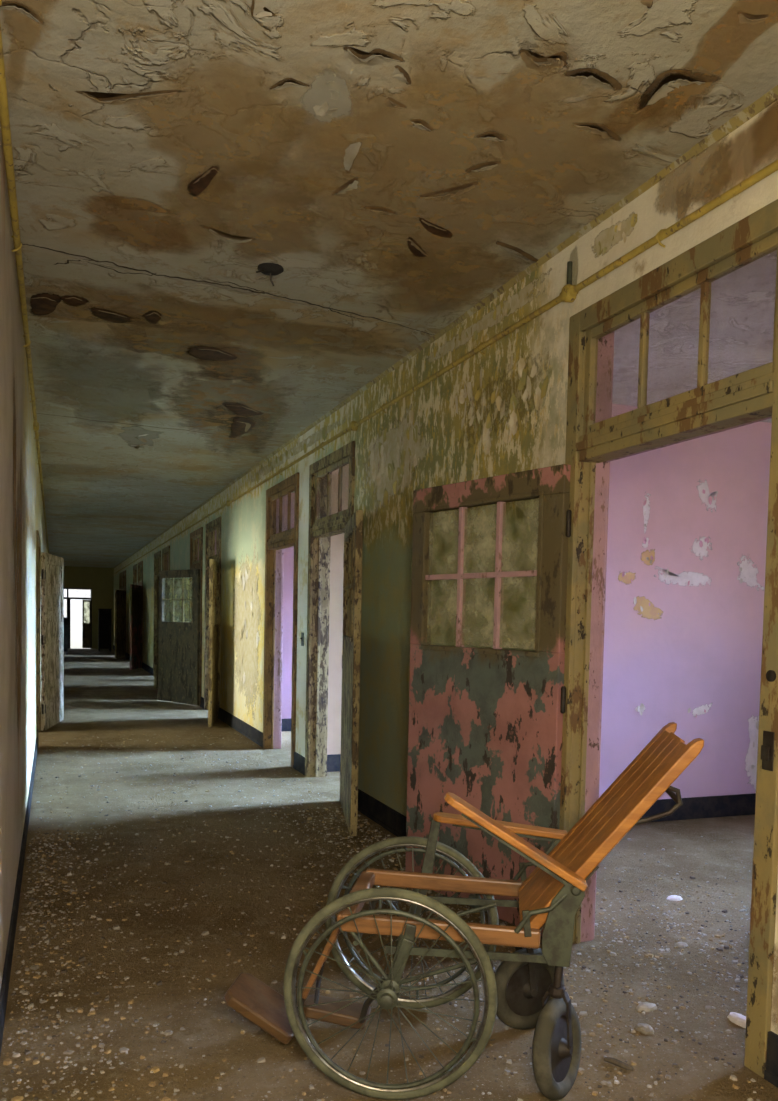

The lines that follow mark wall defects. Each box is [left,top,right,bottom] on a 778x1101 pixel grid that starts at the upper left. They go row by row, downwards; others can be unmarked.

peeling [343,46,411,84]
peeling [519,49,622,90]
peeling [638,69,719,110]
peeling [574,123,621,141]
spalling [188,166,219,196]
peeling [332,142,362,195]
leakage [87,0,778,312]
spalling [419,218,452,238]
peeling [592,213,637,258]
leakage [49,288,376,453]
peeling [640,493,712,586]
peeling [634,596,663,620]